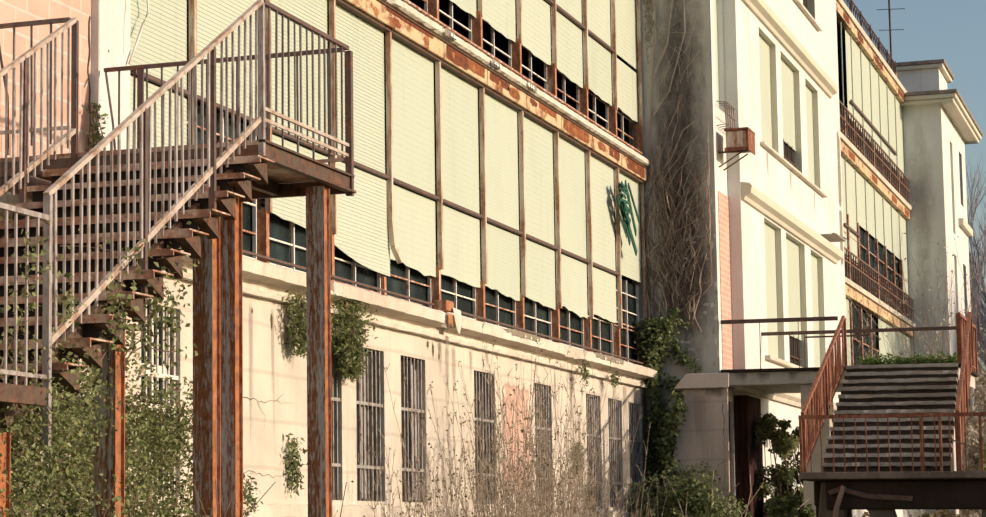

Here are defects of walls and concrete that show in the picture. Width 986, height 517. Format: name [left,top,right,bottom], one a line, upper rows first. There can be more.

rust [374,6,433,43]
rust [446,45,645,178]
flaking render [502,384,531,491]